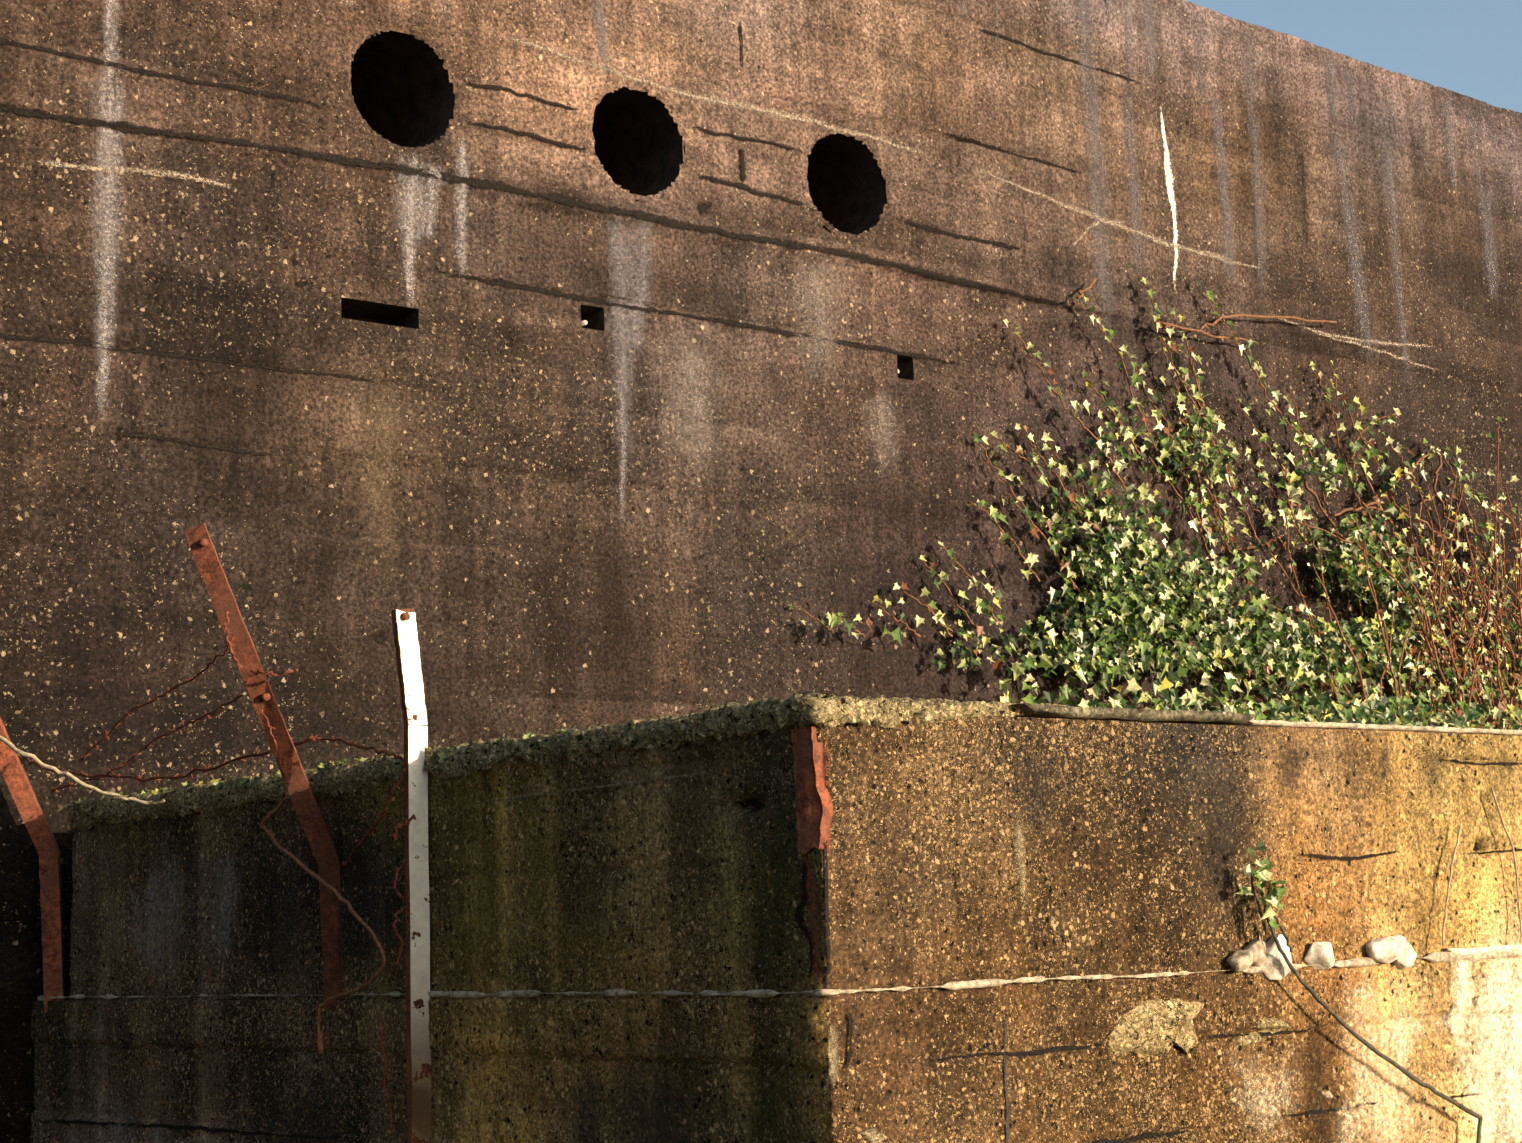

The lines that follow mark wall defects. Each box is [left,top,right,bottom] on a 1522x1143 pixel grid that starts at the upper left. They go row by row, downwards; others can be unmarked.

water stain [105,0,115,68]
water stain [38,88,229,389]
water stain [402,158,441,292]
water stain [457,145,468,266]
water stain [615,261,647,498]
water stain [1347,1056,1396,1133]
water stain [1443,945,1522,1143]